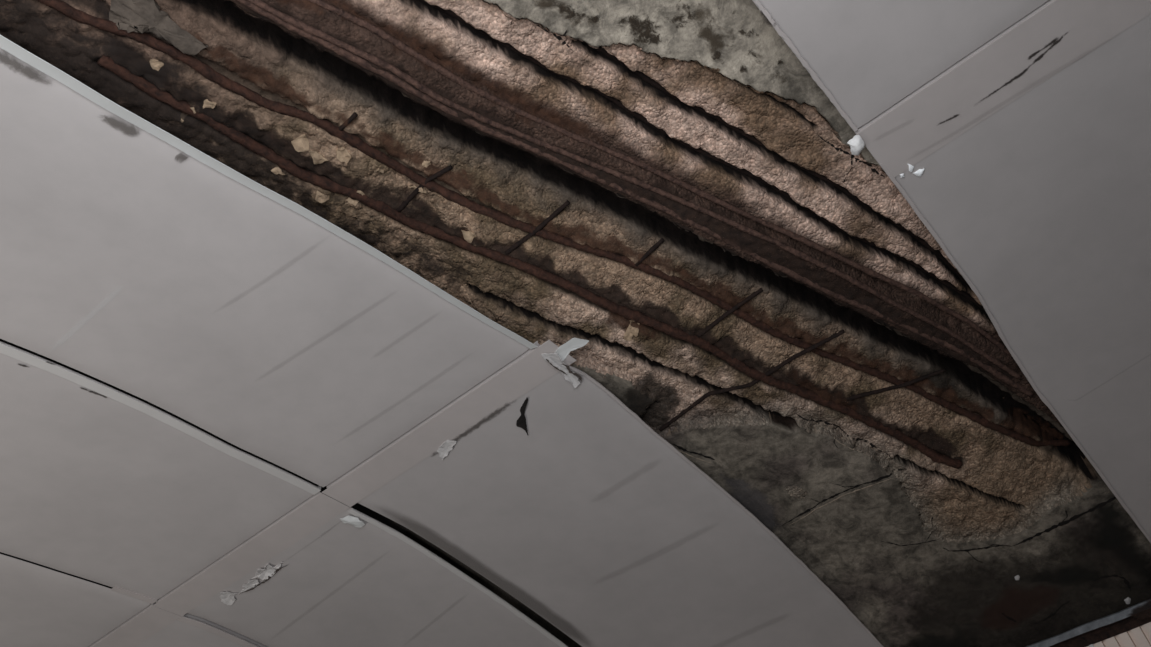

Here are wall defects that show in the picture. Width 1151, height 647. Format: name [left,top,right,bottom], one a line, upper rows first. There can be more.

leakage [537,0,599,24]
leakage [619,15,661,49]
leakage [672,1,757,64]
corrosion [161,0,1063,457]
spalling [23,0,1102,543]
leakage [726,480,775,527]
crack [881,497,1116,563]
leakage [893,505,1151,647]